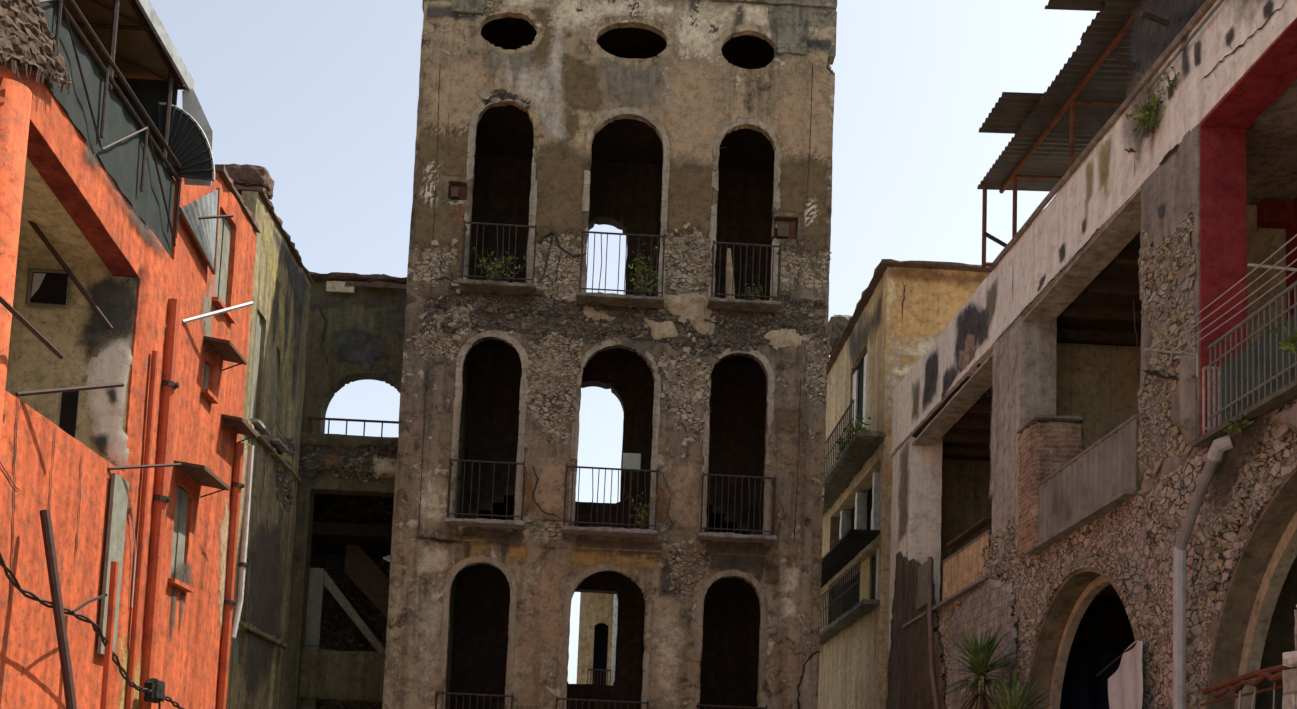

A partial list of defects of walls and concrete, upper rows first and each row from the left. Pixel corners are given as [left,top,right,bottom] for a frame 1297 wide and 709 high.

damp [79,269,145,352]
flaking render [411,222,835,543]
flaking render [1137,209,1196,480]
flaking render [781,568,801,618]